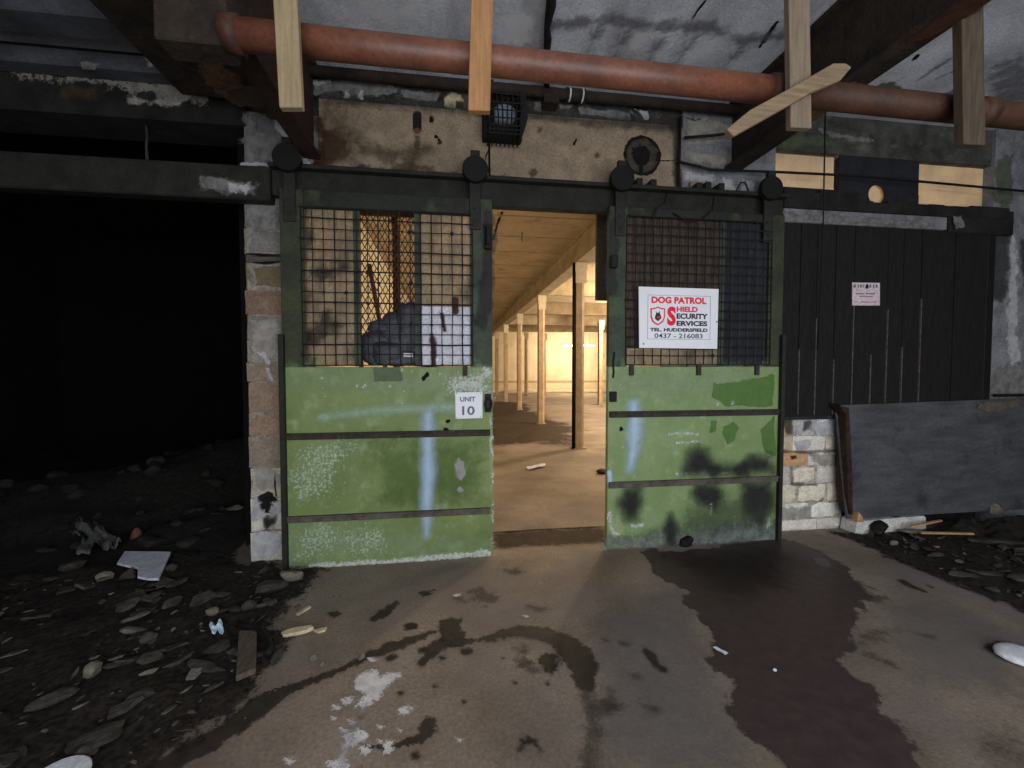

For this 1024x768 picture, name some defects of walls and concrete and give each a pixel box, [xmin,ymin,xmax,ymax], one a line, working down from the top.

corrosion [905,0,989,42]
peeling [11,61,209,107]
peeling [240,113,294,167]
peeling [199,176,279,233]
leakage [641,539,920,768]
leakage [364,715,438,760]